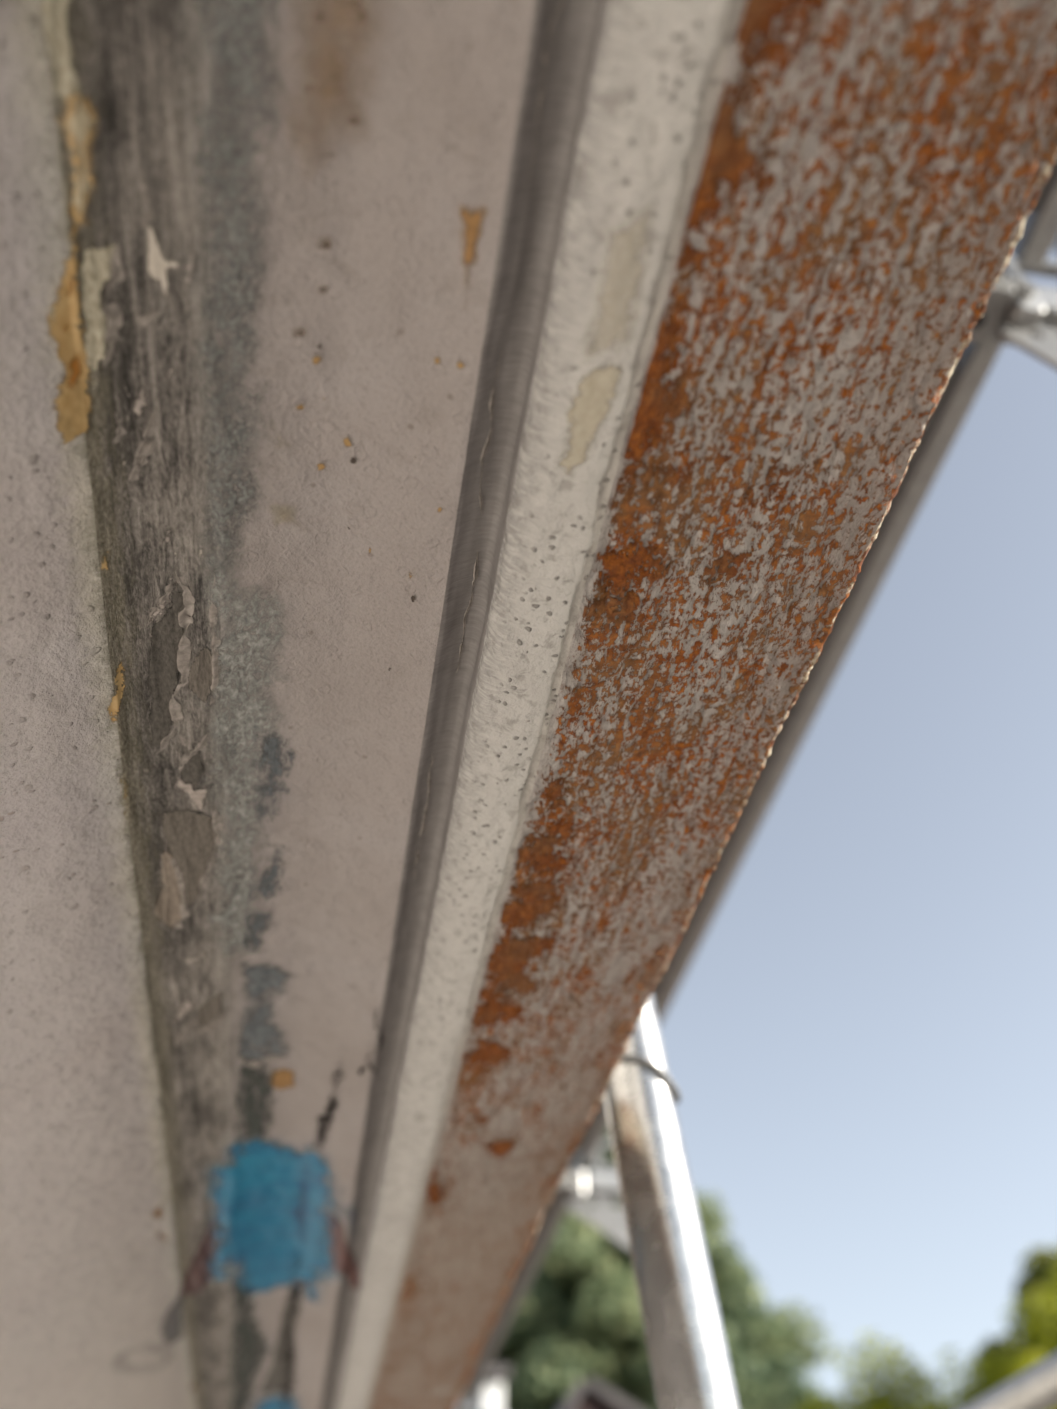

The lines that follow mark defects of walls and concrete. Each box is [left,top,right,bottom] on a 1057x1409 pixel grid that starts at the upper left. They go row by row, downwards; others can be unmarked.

peeling [46,93,196,445]
peeling [113,385,156,486]
peeling [147,569,222,810]
damp [196,0,294,1140]
corrosion [373,0,1057,1409]
peeling [154,850,190,935]
crack [313,1010,384,1151]
damp [228,1275,272,1409]